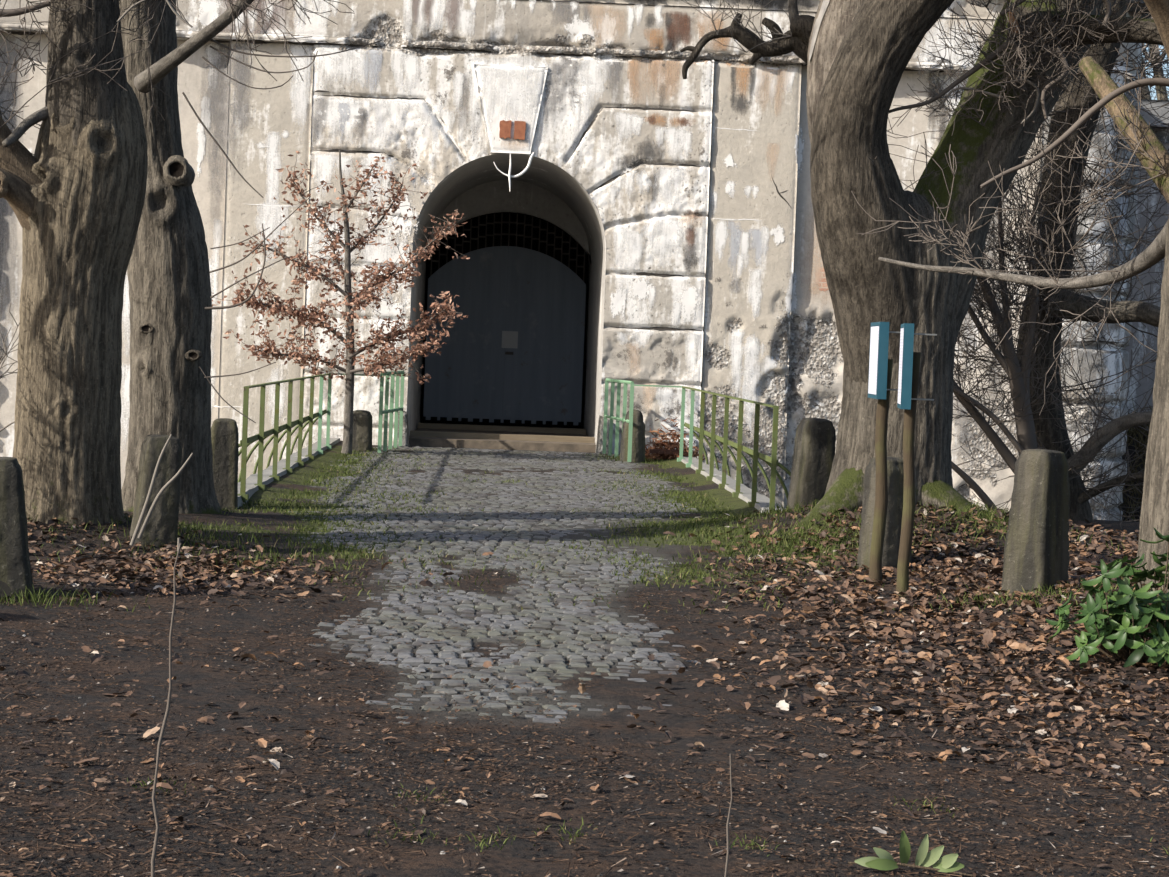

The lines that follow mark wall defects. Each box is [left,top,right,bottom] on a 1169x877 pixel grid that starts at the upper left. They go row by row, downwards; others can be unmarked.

leakage [741,0,810,11]
rust [629,13,727,89]
rust [730,61,756,111]
leakage [753,63,797,99]
leakage [196,0,682,353]
leakage [608,112,691,207]
leakage [794,123,805,178]
leakage [695,154,785,315]
leakage [673,285,703,325]
leakage [783,272,798,326]
leakage [729,329,778,433]